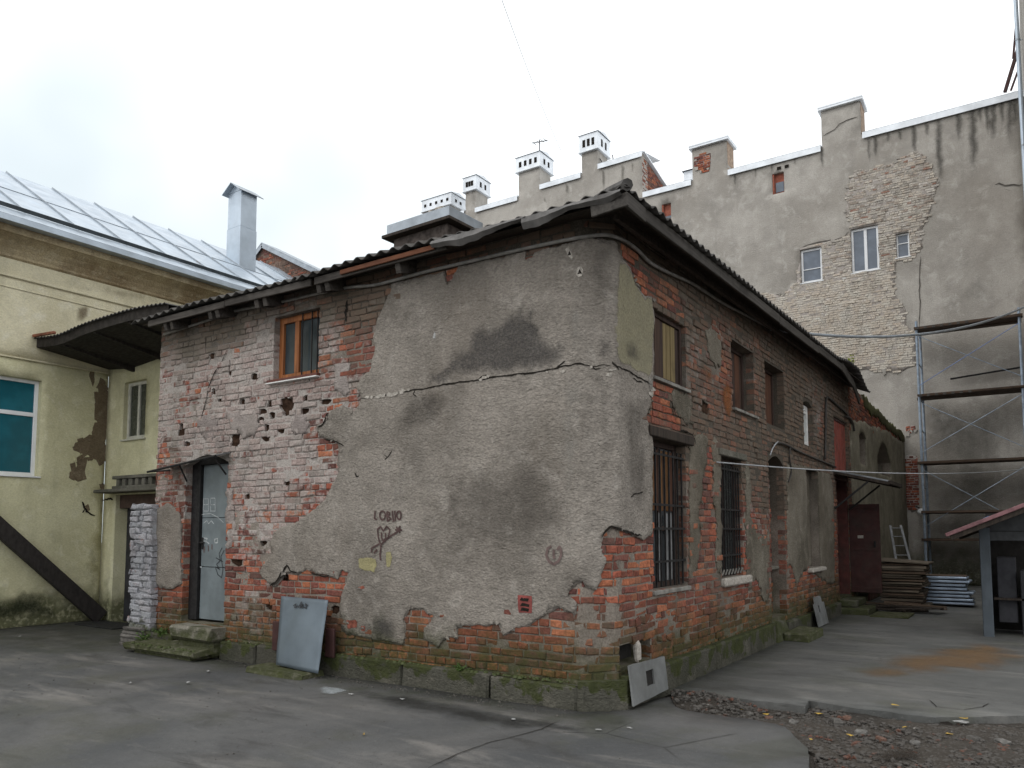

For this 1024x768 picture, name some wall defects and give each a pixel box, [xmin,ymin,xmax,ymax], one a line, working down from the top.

damp [957,99,1017,155]
spalling [762,151,939,375]
spalling [69,371,108,485]
spalling [258,394,361,525]
damp [433,317,557,380]
crack [360,361,696,443]
spalling [696,447,720,583]
spalling [267,568,365,644]
spalling [402,526,682,681]